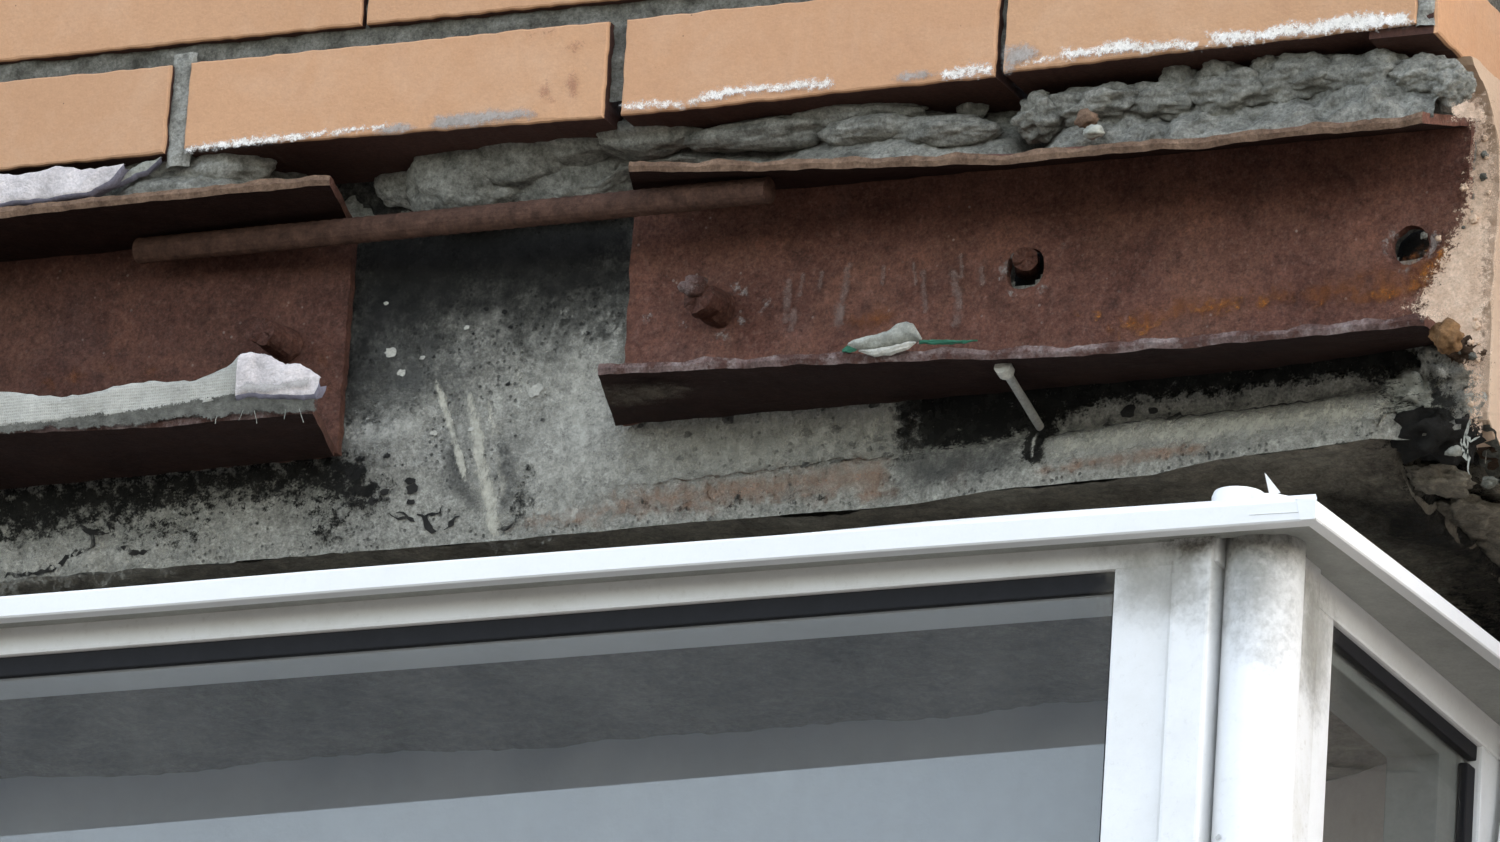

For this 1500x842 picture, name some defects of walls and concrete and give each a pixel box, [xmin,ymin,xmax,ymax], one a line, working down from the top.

flaking render [0,157,163,207]
flaking render [0,352,326,434]
water stain [0,318,1435,580]
spalling [1381,335,1500,567]
rust [1428,317,1465,355]
water stain [1333,461,1500,641]